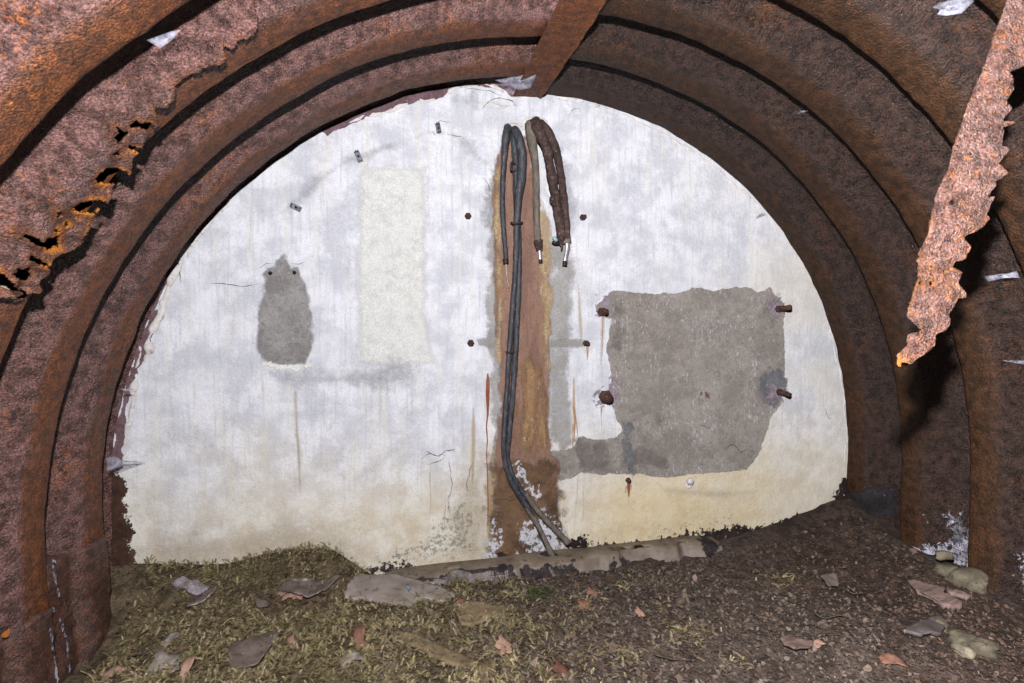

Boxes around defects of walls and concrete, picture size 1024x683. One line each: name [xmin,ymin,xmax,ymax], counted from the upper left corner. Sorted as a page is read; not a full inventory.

flaking render [257,256,312,365]
corrosion [472,136,571,559]
flaking render [548,242,787,481]
corrosion [896,0,1024,367]